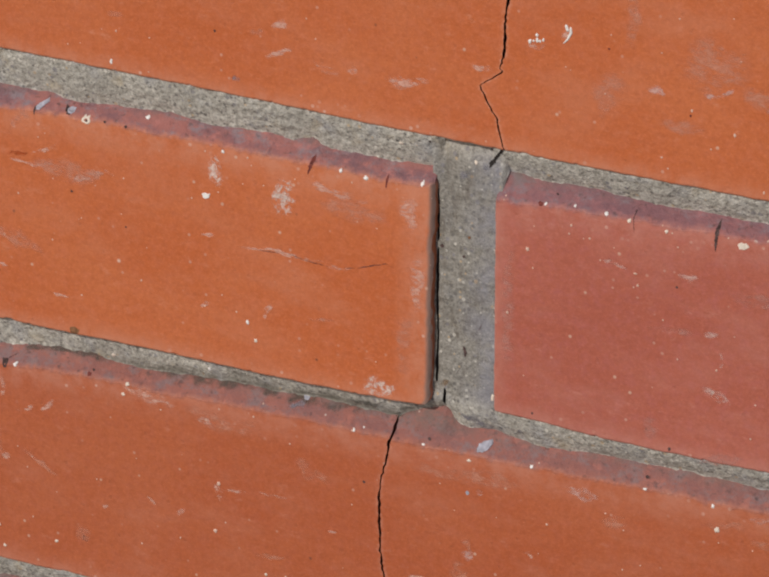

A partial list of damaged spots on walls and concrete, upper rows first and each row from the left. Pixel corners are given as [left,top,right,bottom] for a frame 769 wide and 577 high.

crack [480,0,510,168]
crack [377,415,399,577]